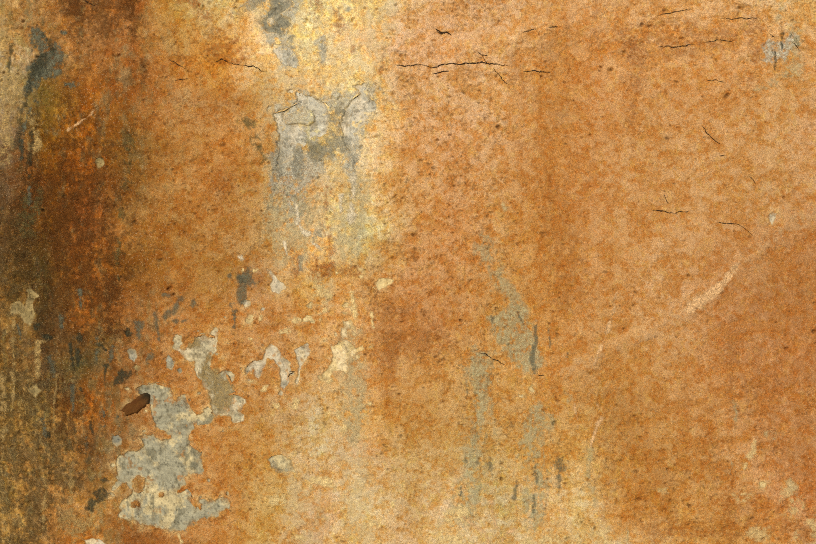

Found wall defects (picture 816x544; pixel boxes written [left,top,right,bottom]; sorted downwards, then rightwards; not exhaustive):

crack [401,51,507,84]
spalling [267,83,378,172]
spalling [110,325,310,532]